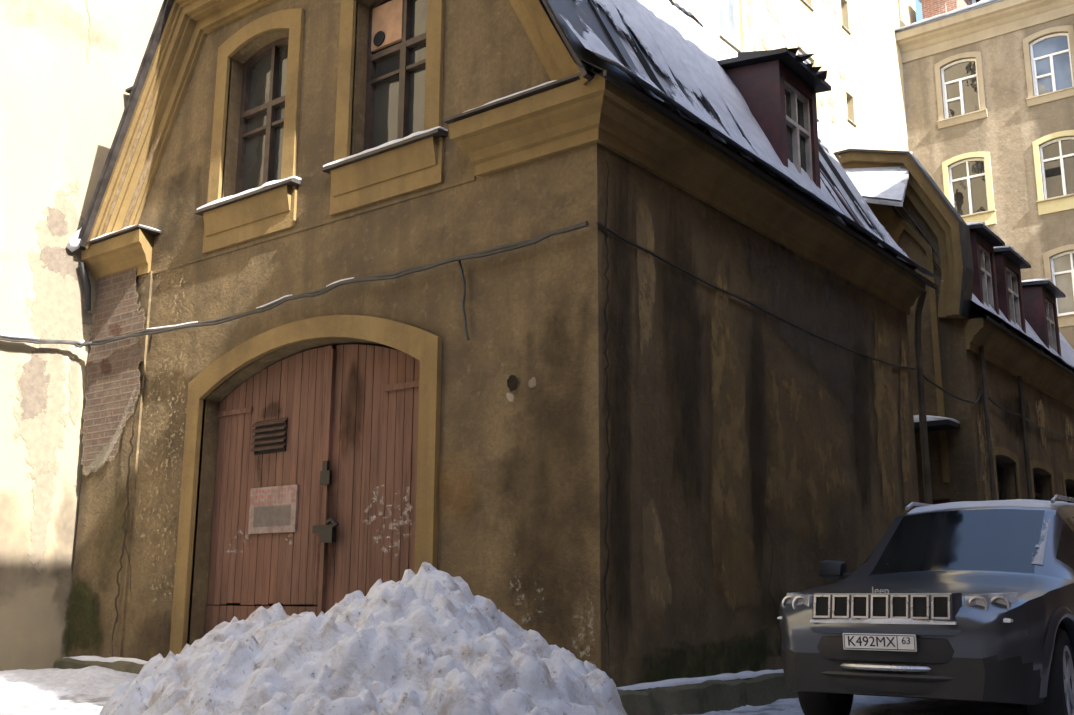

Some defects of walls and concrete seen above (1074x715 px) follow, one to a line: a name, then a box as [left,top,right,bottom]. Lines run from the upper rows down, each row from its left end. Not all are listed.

flaking render [10,180,188,602]
crack [112,395,141,657]
leakage [643,630,781,683]
leakage [608,186,910,625]